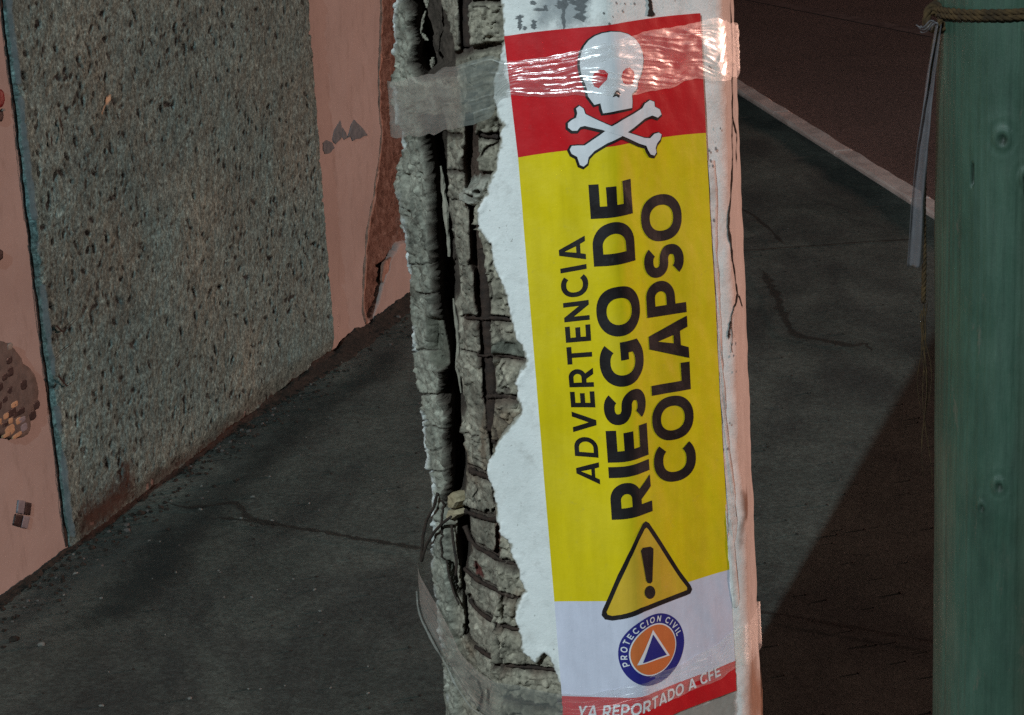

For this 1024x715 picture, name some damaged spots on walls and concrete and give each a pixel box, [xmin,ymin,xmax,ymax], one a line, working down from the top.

spalling [322,0,563,715]
crack [727,14,743,351]